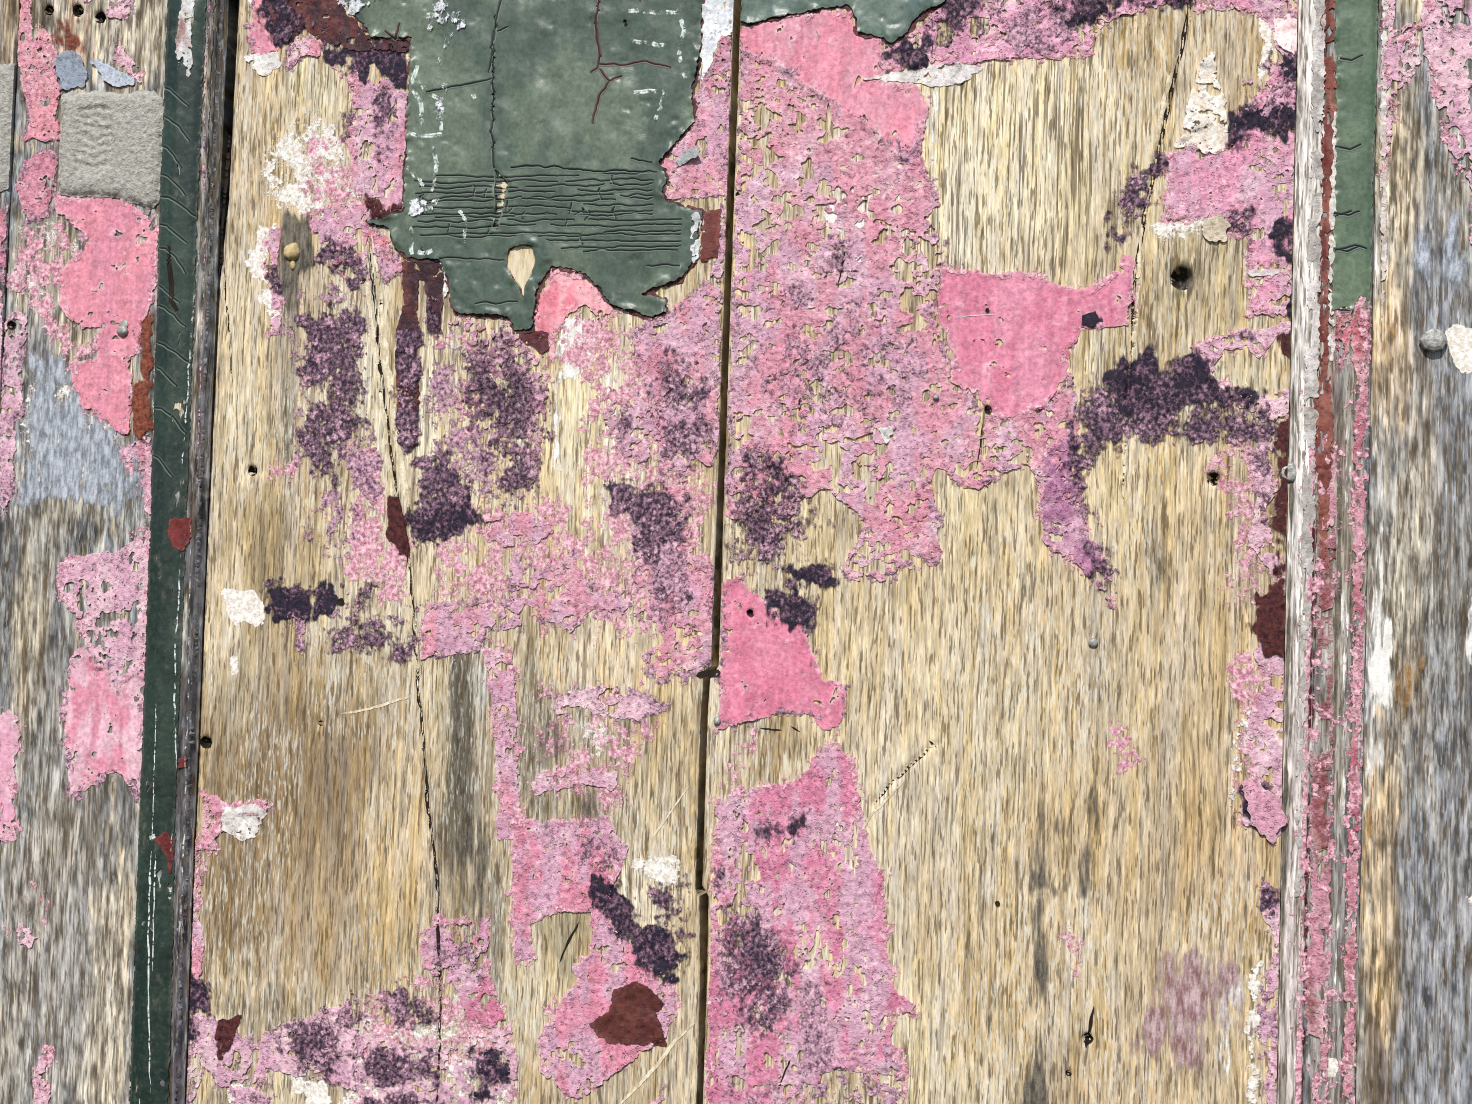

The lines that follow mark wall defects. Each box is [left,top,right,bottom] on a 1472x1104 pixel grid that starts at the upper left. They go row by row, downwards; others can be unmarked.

peeling [0,0,207,1104]
crack [368,241,442,1102]
crack [474,298,518,306]
crack [383,0,687,268]
peeling [186,0,1298,1104]